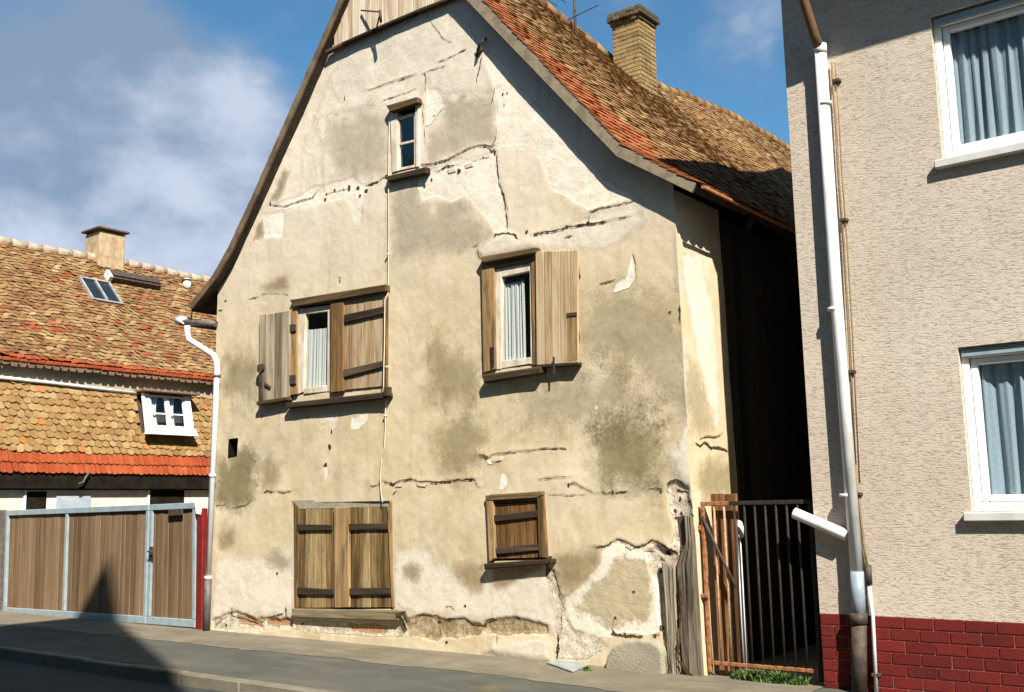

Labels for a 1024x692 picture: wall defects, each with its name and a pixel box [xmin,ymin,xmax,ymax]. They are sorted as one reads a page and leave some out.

crack [344,16,636,256]
crack [269,174,388,207]
peeling [613,256,635,293]
crack [695,432,727,451]
crack [370,447,567,495]
peeling [211,472,693,659]
crack [539,476,694,676]